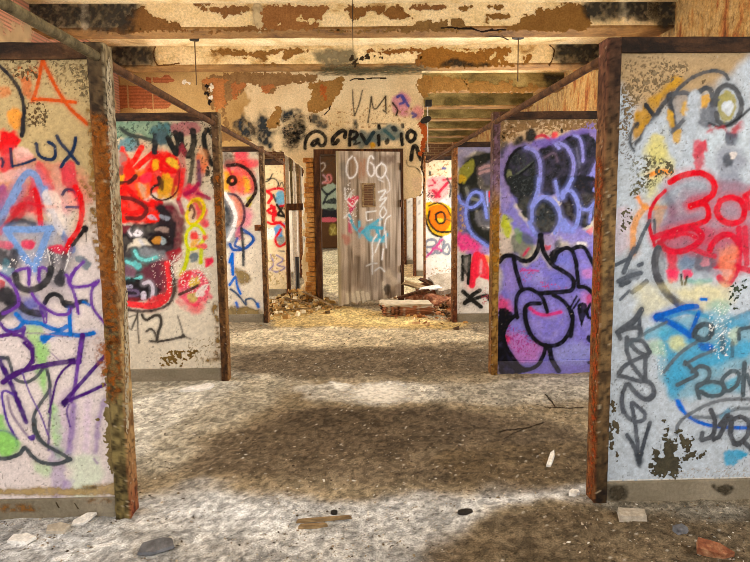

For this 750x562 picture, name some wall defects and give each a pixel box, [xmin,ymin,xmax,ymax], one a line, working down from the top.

peeling [107,3,474,35]
crack [441,27,509,40]
peeling [486,2,593,33]
peeling [201,47,345,142]
corrosion [213,175,223,240]
corrosion [80,109,123,400]
corrosion [491,205,502,272]
spalling [159,345,209,367]
corrosion [207,303,220,362]
corrosion [588,158,602,495]
spalling [648,419,707,480]